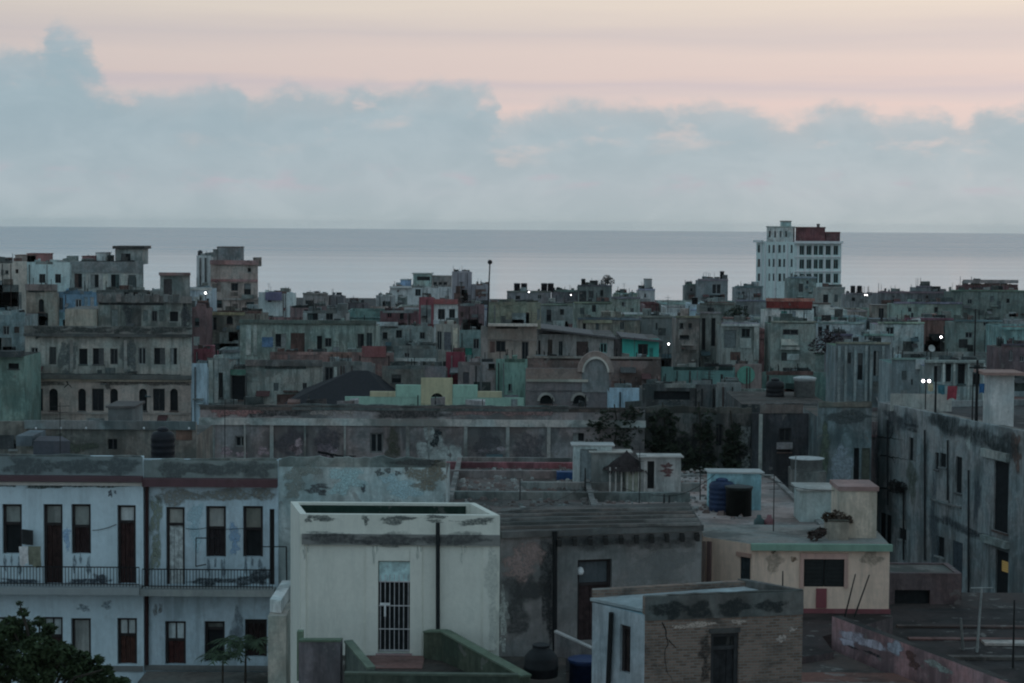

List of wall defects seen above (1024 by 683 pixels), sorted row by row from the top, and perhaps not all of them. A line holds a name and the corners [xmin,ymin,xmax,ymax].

water stain [0,434,139,489]
peeling [284,438,337,498]
water stain [504,542,553,638]